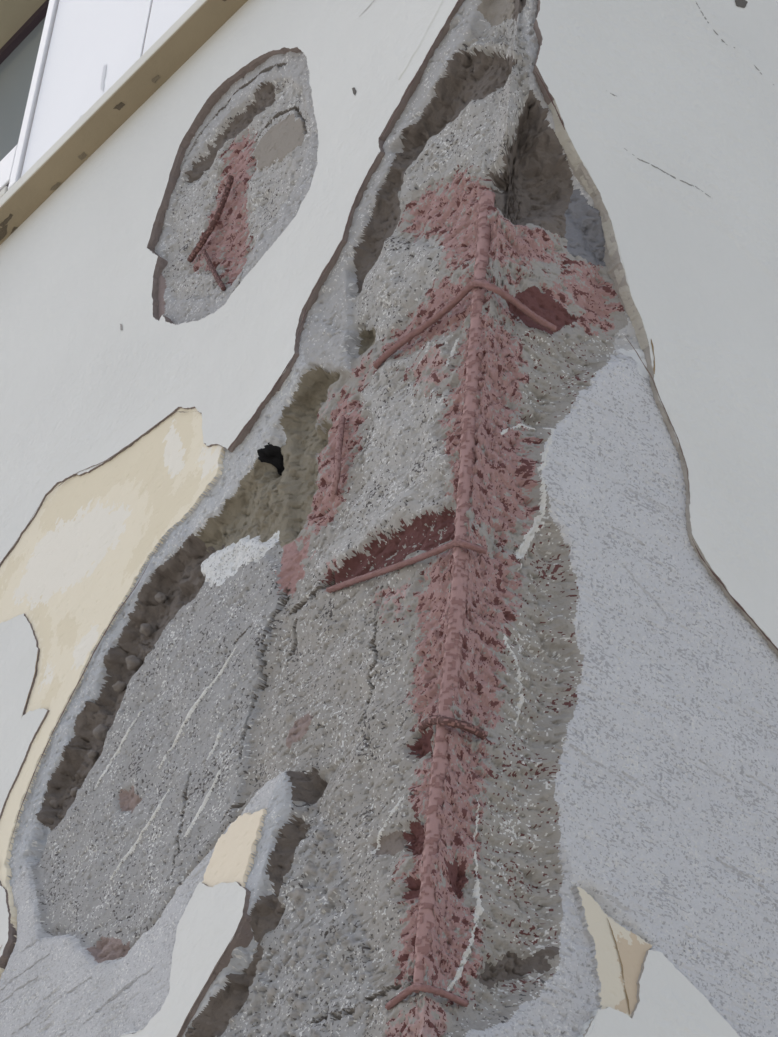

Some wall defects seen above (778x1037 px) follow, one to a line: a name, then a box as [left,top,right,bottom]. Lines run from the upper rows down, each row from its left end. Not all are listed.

corrosion [180,125,259,293]
spalling [0,0,649,949]
corrosion [272,160,629,1037]
spalling [444,514,584,1037]
peeling [571,885,653,1017]